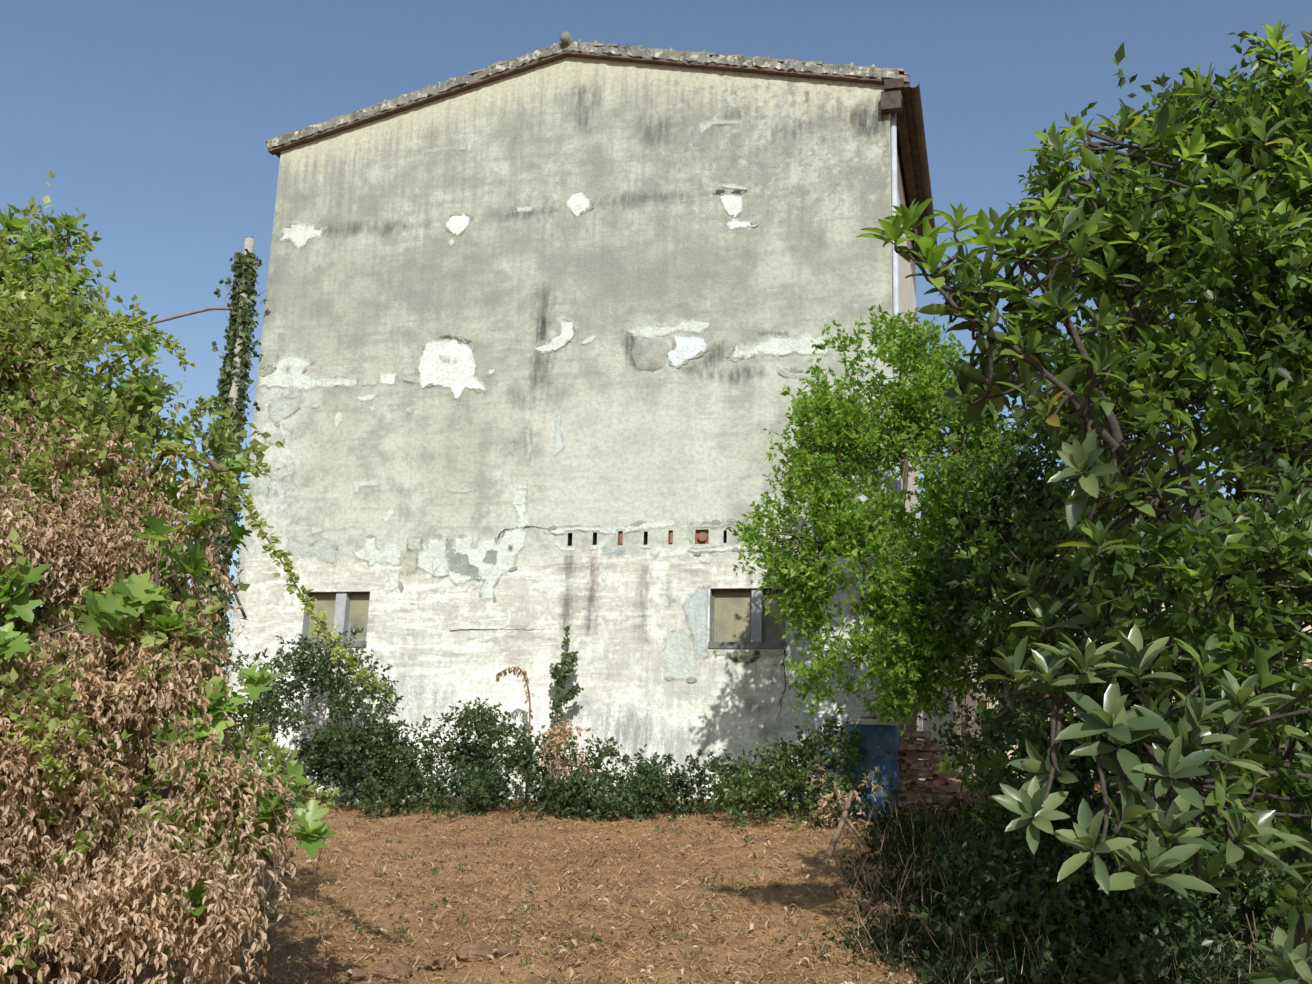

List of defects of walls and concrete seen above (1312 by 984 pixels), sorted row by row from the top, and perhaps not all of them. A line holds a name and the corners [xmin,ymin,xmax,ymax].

spalling [280,221,326,249]
spalling [443,210,473,246]
spalling [562,190,595,219]
spalling [713,183,759,229]
spalling [535,318,595,354]
spalling [629,319,830,384]
spalling [257,335,494,444]
peeling [545,518,749,562]
peeling [286,515,535,627]